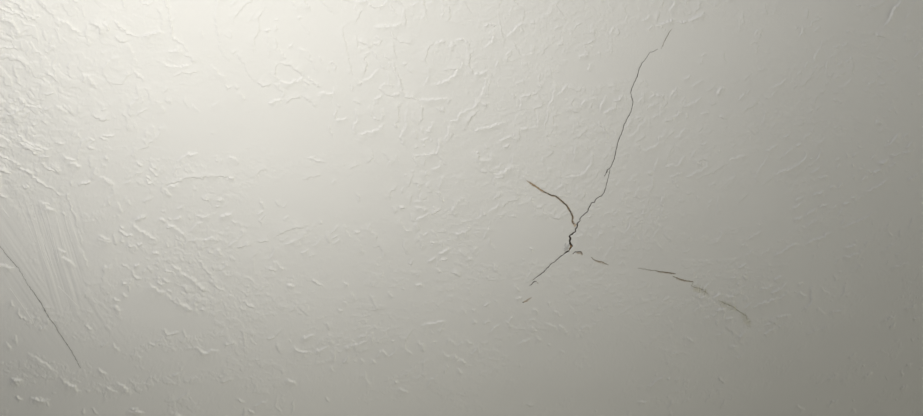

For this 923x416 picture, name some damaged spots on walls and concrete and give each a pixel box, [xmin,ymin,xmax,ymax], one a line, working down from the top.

crack [529,29,672,285]
crack [641,268,747,318]